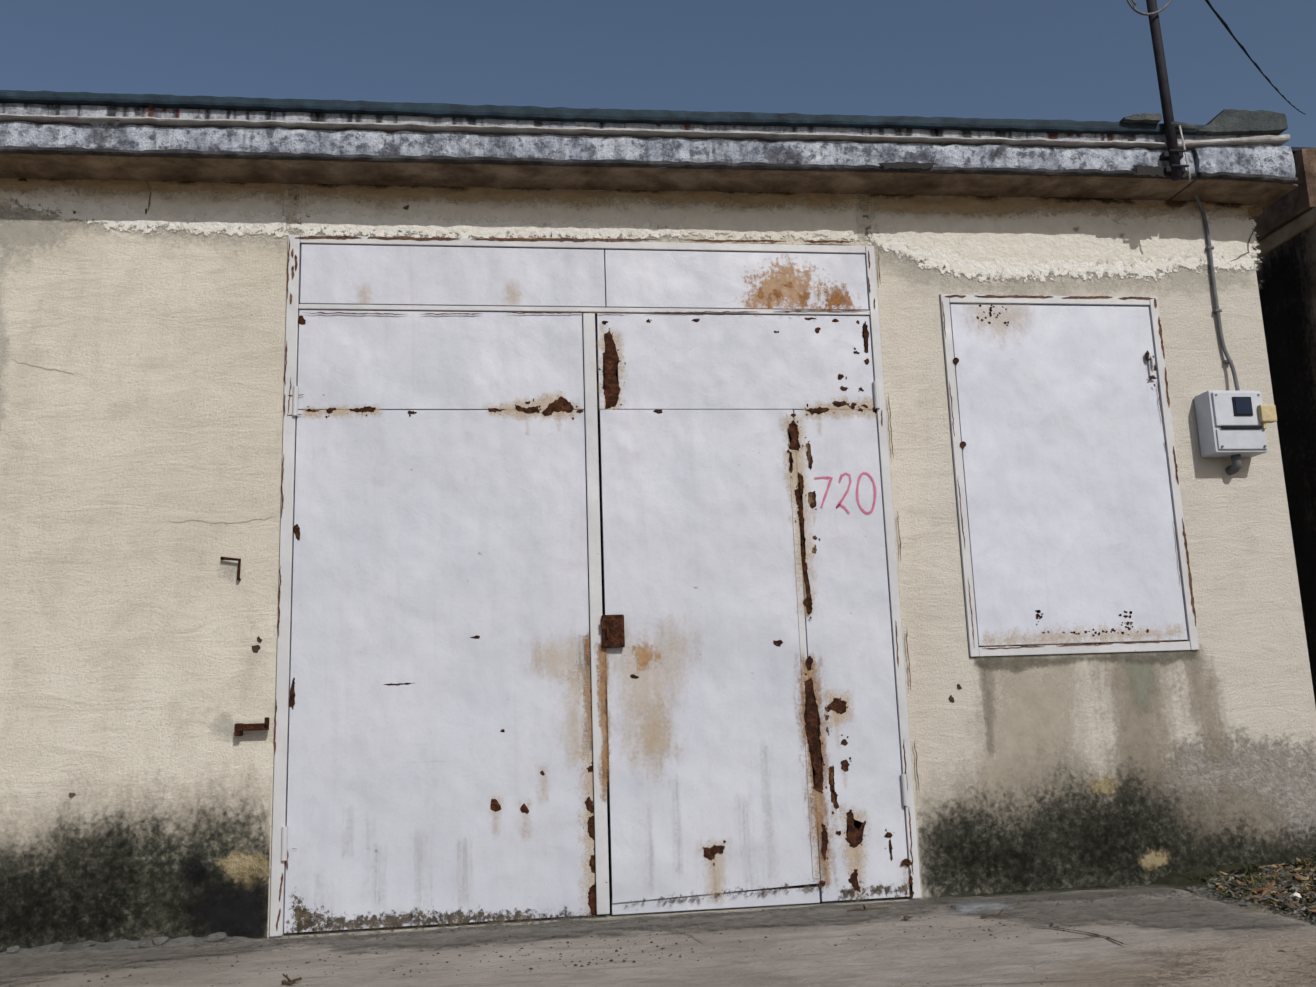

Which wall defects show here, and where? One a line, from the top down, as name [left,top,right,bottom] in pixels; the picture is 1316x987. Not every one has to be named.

corrosion [287,236,656,325]
corrosion [488,391,583,419]
corrosion [513,312,632,410]
peeling [0,184,1262,283]
corrosion [646,239,881,365]
corrosion [787,374,894,619]
damp [1256,231,1316,706]
corrosion [968,581,1177,649]
corrosion [582,635,610,916]
damp [0,651,1316,987]
corrosion [799,656,866,893]
corrosion [884,812,914,898]